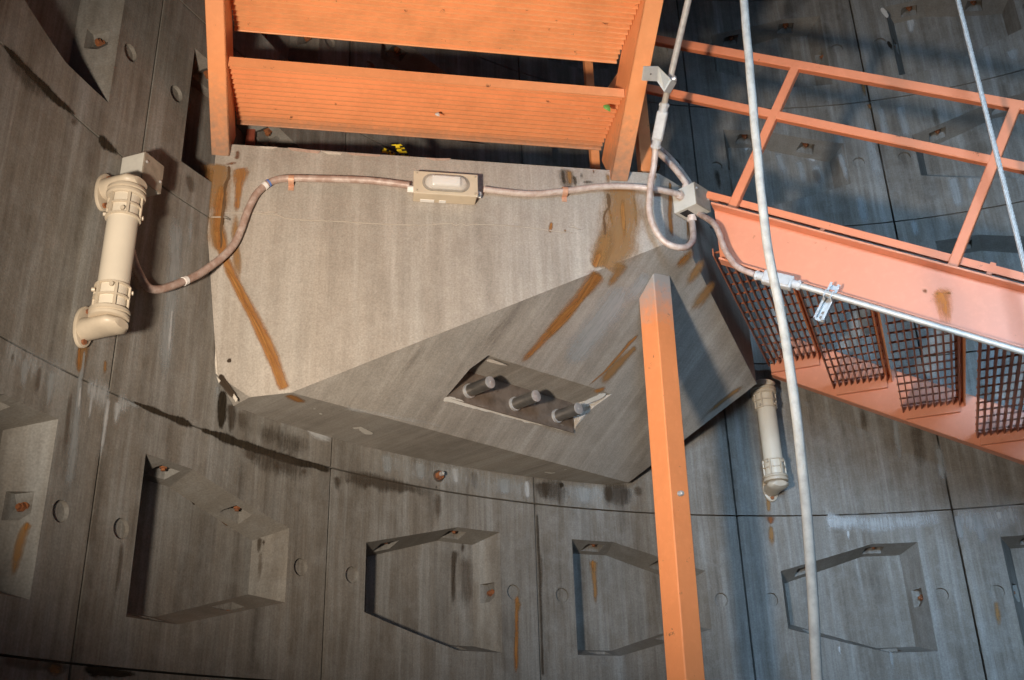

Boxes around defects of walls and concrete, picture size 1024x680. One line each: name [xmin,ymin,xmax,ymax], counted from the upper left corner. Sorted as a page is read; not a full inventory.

rust [208,151,304,402]
rust [524,175,643,359]
rust [12,523,30,571]